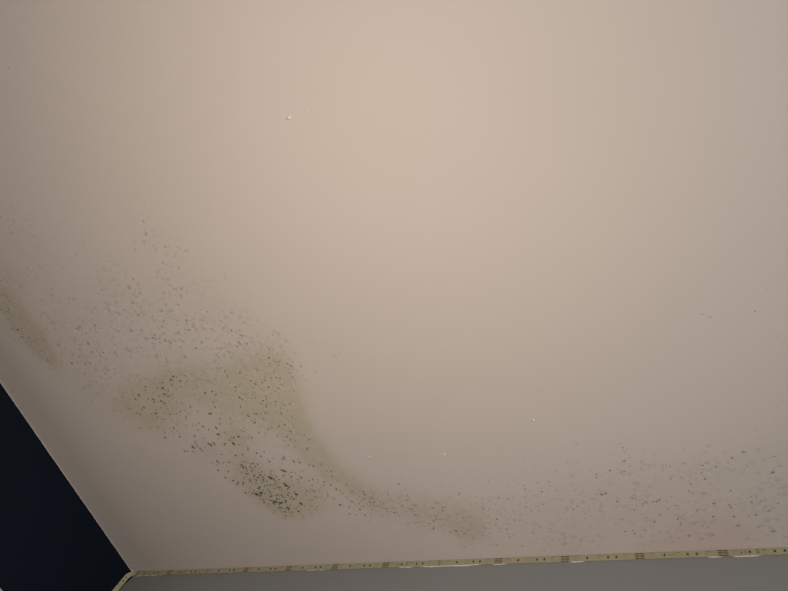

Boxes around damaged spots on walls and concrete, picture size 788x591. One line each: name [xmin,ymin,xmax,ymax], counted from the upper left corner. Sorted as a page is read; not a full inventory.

water stain [217,447,302,517]